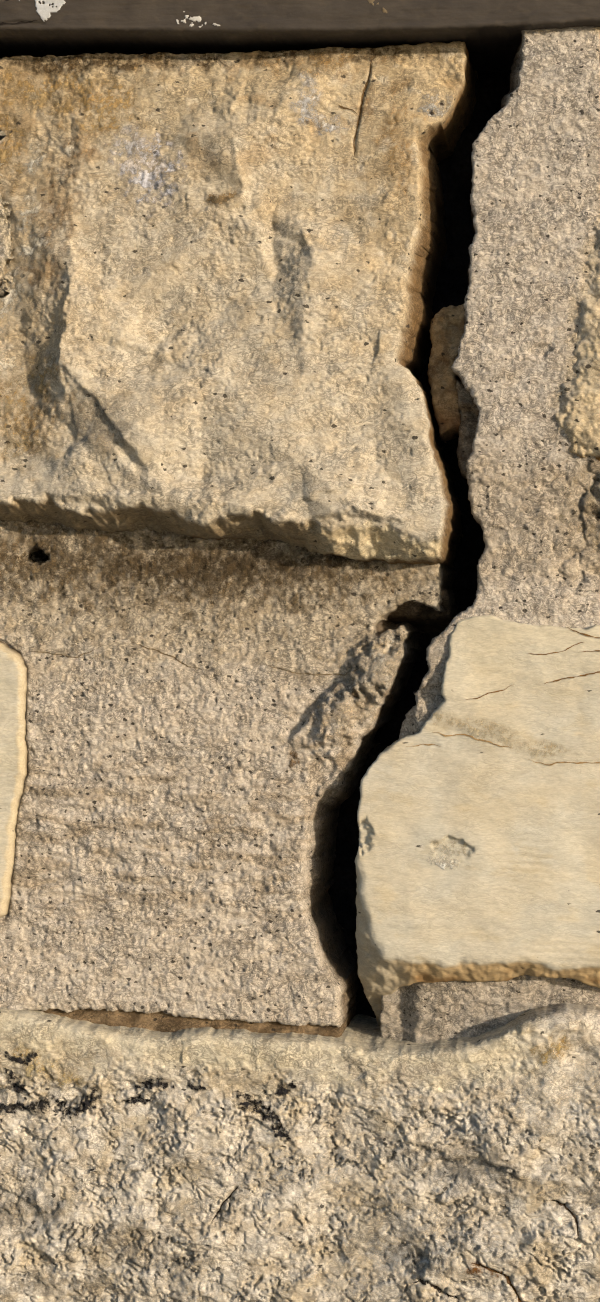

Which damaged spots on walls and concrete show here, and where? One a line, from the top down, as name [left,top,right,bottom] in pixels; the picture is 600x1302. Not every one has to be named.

peeling [19,0,66,21]
crack [339,59,372,156]
crack [419,70,511,399]
crack [31,642,202,670]
crack [268,665,362,676]
crack [328,436,600,1018]